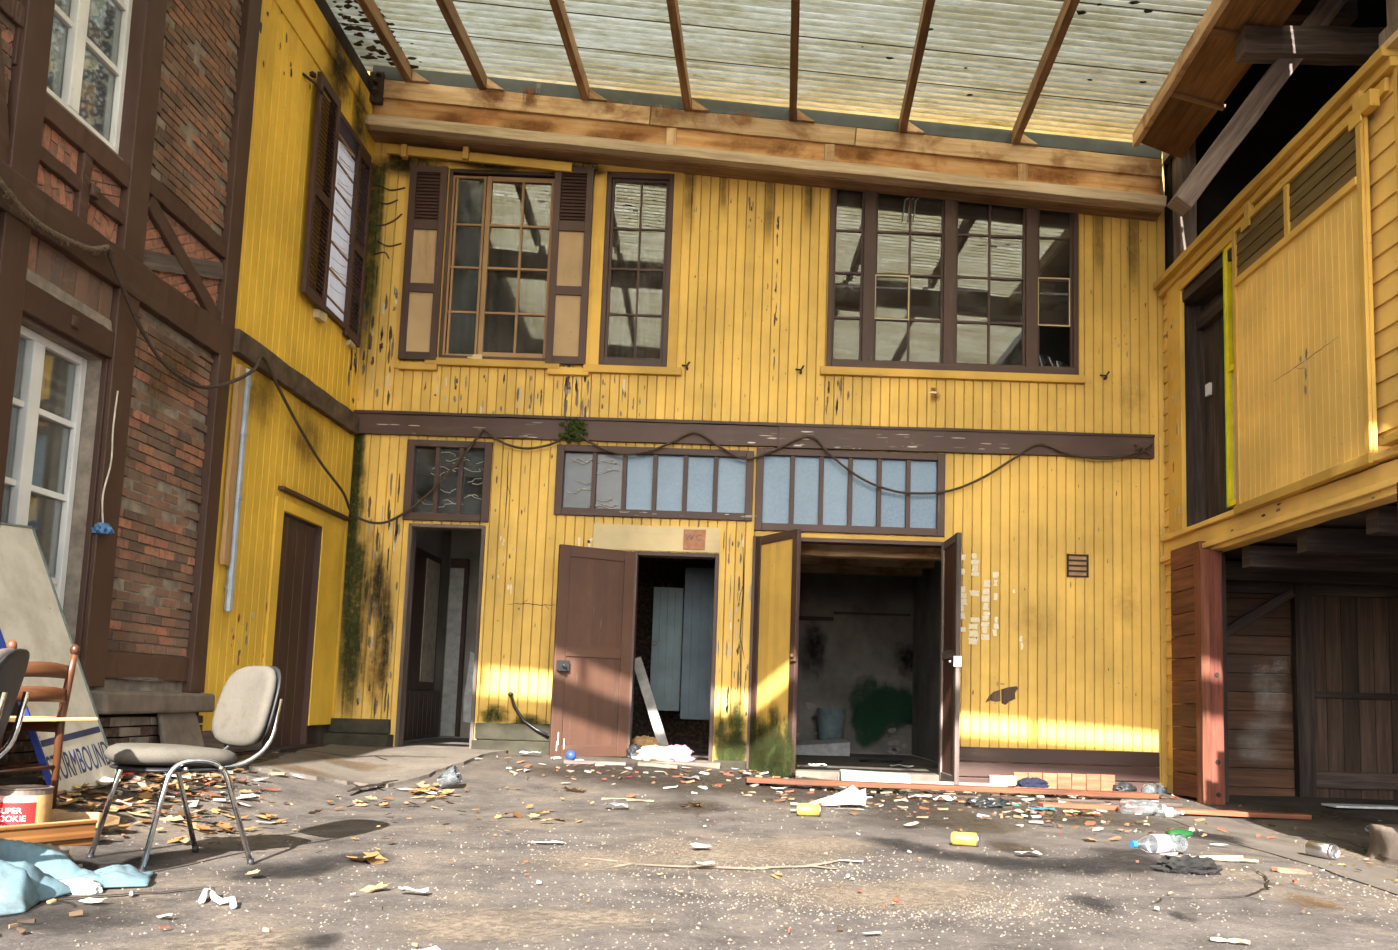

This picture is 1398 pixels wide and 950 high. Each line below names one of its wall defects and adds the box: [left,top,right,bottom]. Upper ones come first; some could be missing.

peeling [730,197,787,331]
peeling [348,258,398,405]
peeling [424,365,645,438]
leakage [371,554,392,689]
peeling [972,682,1018,705]